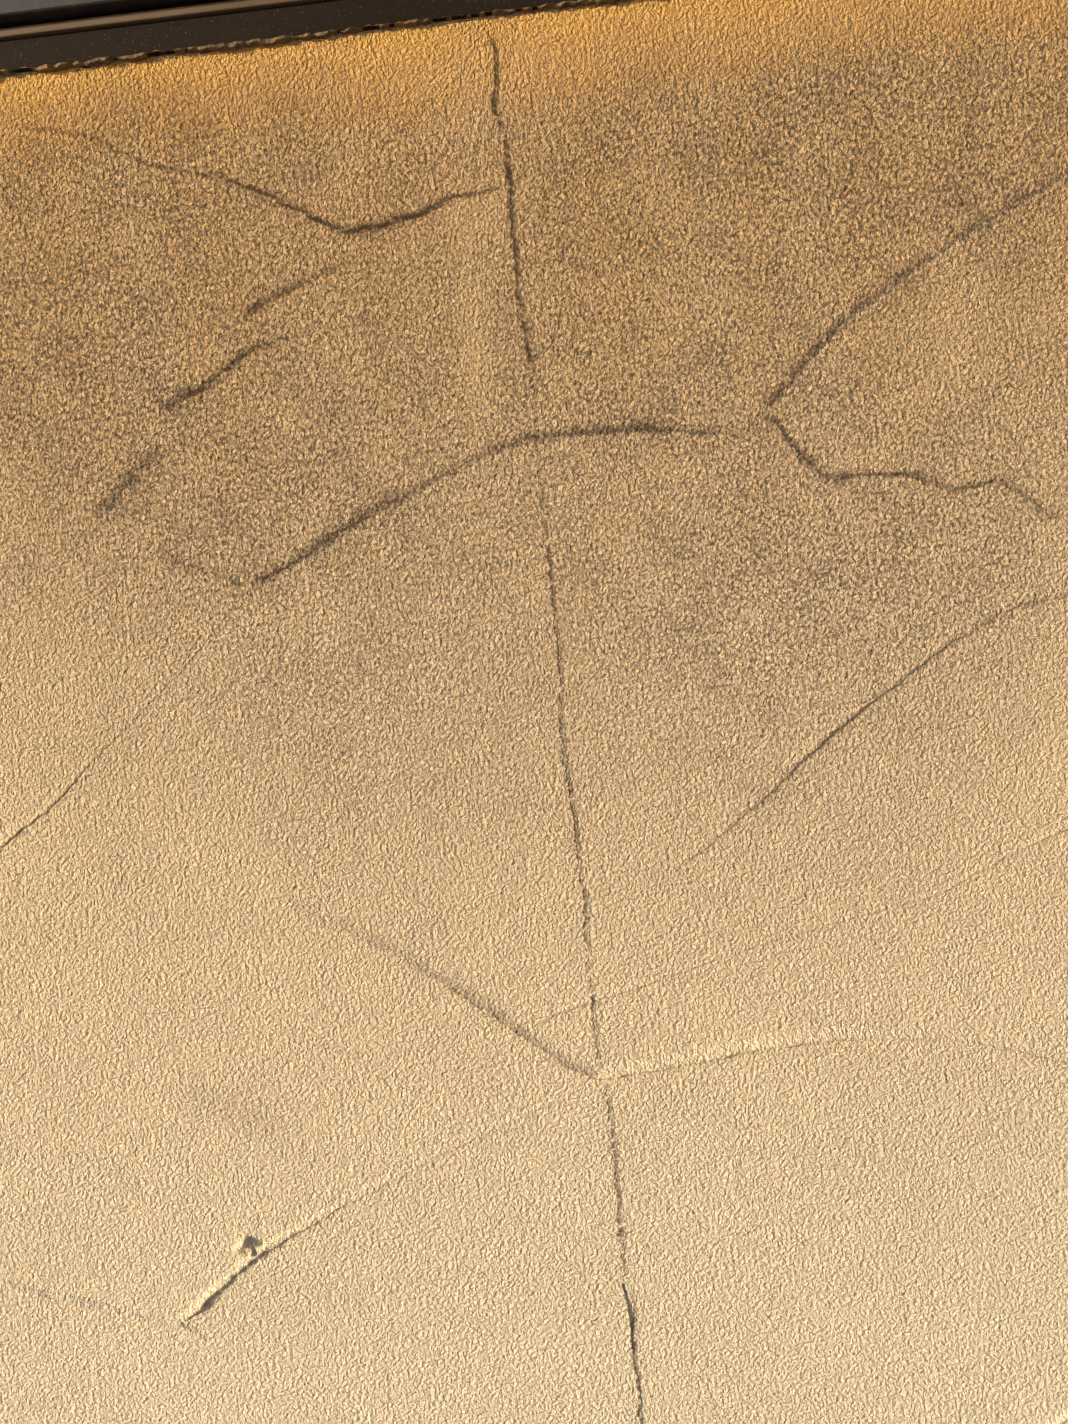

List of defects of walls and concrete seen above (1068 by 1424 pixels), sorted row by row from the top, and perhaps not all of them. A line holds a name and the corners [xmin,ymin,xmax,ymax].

water stain [0,0,1068,145]
crack [194,39,534,409]
water stain [704,76,1038,236]
water stain [0,228,215,467]
crack [163,346,254,406]
crack [769,342,825,402]
crack [536,452,642,1424]